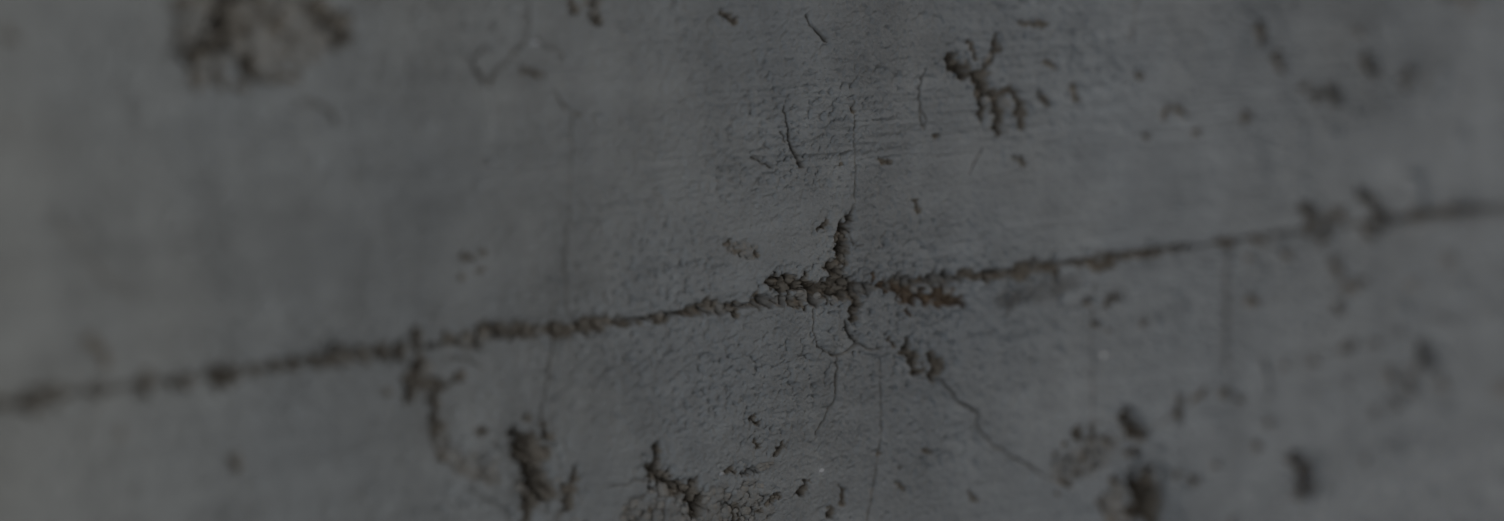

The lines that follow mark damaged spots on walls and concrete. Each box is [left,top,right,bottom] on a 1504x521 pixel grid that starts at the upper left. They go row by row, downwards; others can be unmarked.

spalling [153,0,367,101]
spalling [933,32,1083,169]
crack [809,304,887,521]
crack [933,376,1054,482]
crack [1079,279,1150,424]
spalling [1063,390,1189,518]